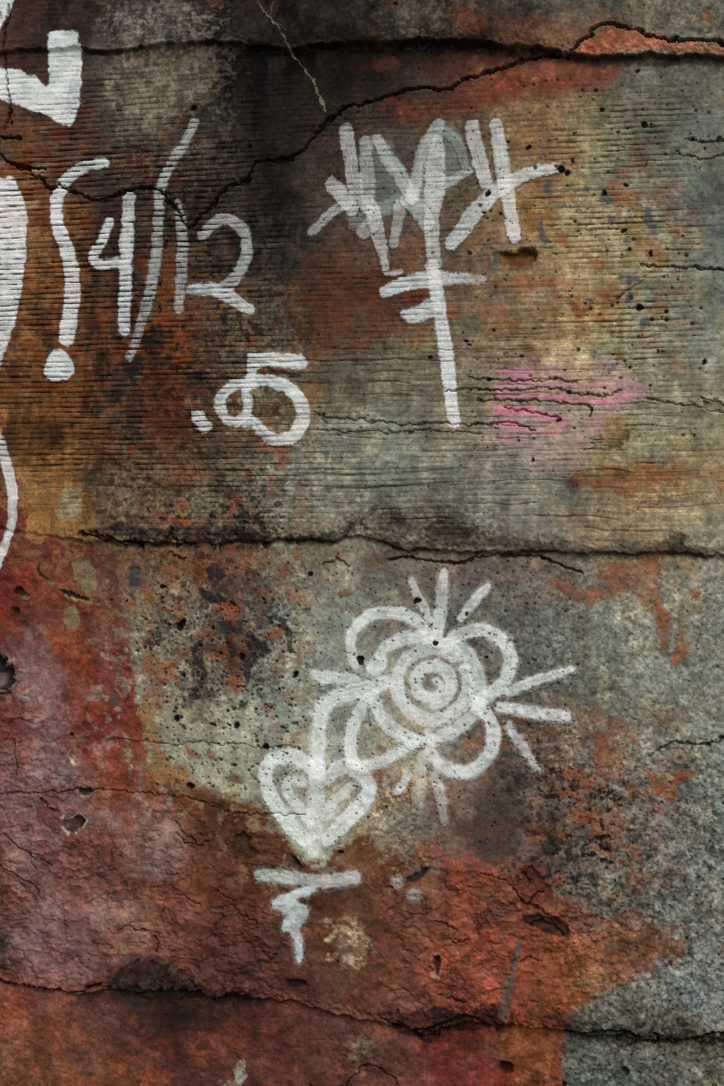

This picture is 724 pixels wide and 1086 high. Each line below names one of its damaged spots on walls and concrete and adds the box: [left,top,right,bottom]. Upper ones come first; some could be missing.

damp [89,0,378,264]
crack [0,0,724,230]
damp [373,0,445,52]
rust [374,7,724,162]
damp [561,50,724,72]
peeling [0,405,16,457]
spalling [599,412,634,455]
crack [76,530,197,561]
rust [144,541,306,623]
crack [386,551,584,574]
rust [128,654,263,806]
peeling [0,468,655,1086]